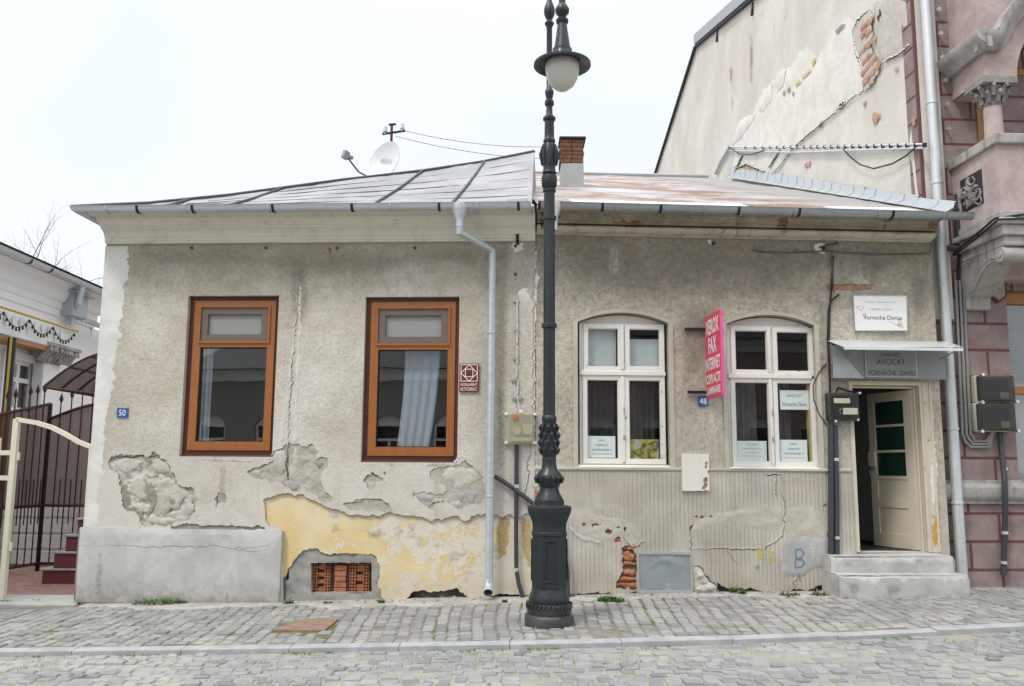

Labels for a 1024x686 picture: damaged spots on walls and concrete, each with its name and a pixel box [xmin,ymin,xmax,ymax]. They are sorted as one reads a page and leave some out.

peeling [732,0,907,173]
crack [278,282,302,446]
crack [523,242,540,505]
spalling [109,452,198,527]
peeling [248,443,532,599]
flaking render [582,523,637,590]
crack [689,472,787,564]